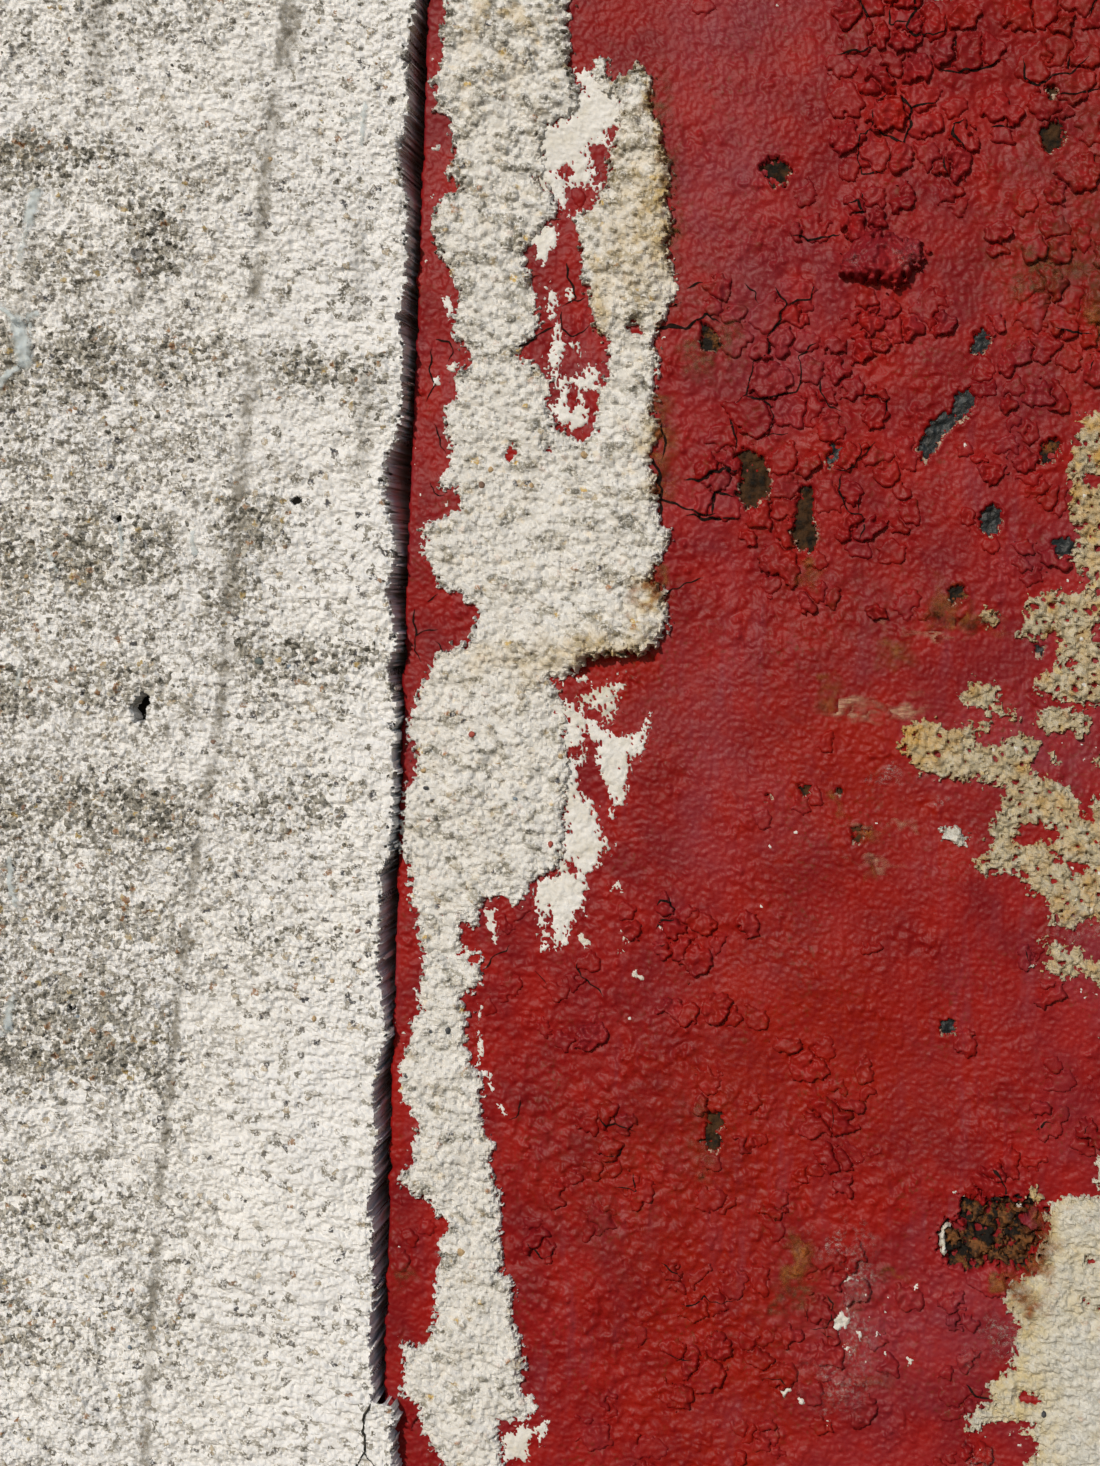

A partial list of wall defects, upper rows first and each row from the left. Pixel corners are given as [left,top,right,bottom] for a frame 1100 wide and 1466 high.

crack [793,0,1100,242]
crack [1052,326,1100,382]
crack [652,282,887,541]
crack [661,578,700,600]
peeling [1032,645,1047,660]
spalling [937,1193,1051,1279]
rust [989,1213,1048,1318]